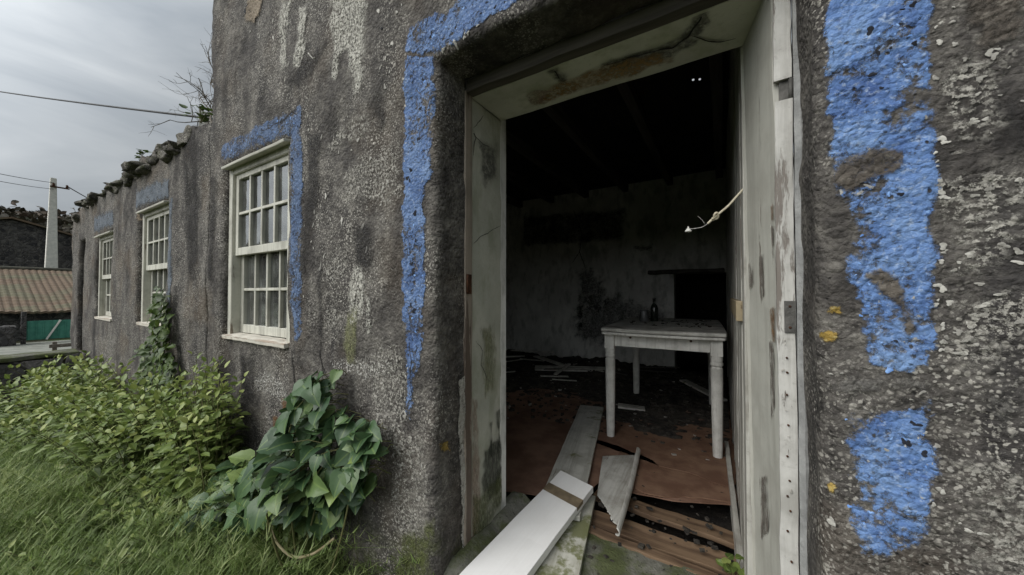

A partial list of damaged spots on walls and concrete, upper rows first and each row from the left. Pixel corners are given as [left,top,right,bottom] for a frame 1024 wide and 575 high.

peeling [320,0,516,548]
water stain [472,409,502,537]
crack [603,17,736,66]
peeling [823,0,1024,555]